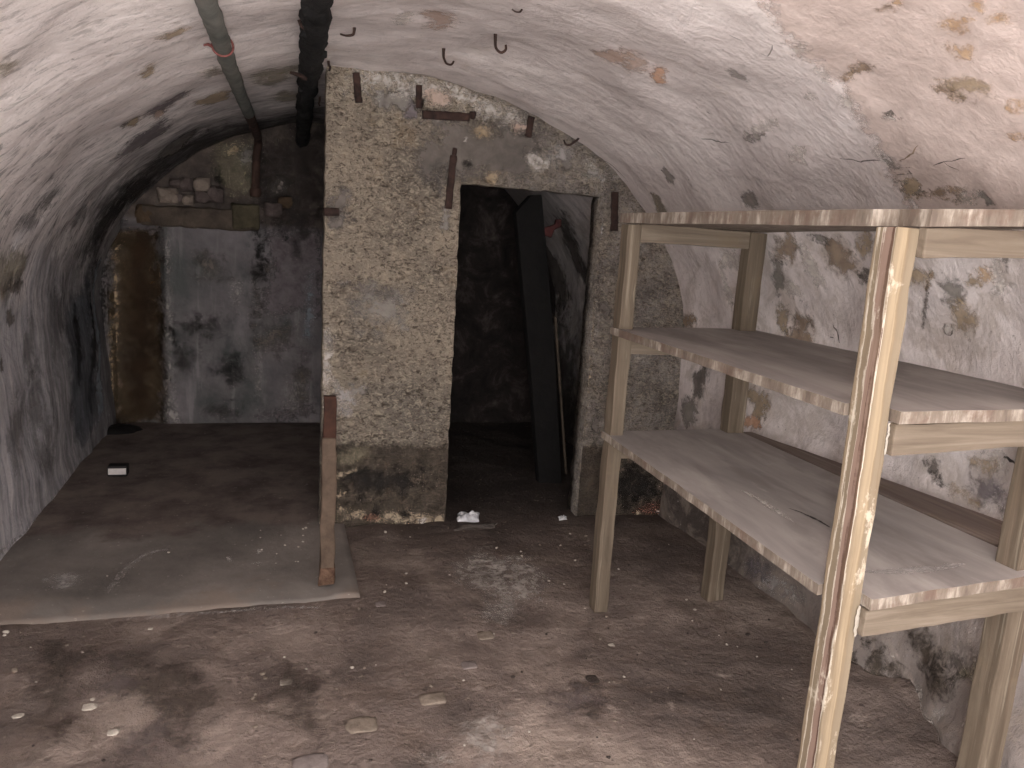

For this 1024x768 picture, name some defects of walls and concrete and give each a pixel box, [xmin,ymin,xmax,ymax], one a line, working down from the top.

spalling [594,50,665,84]
peeling [758,0,1024,210]
crack [840,146,964,170]
leakage [52,259,104,446]
corrosion [100,226,172,424]
leakage [234,233,291,390]
leakage [922,282,976,331]
leakage [335,440,448,527]
leakage [851,641,903,679]
leakage [907,628,974,700]